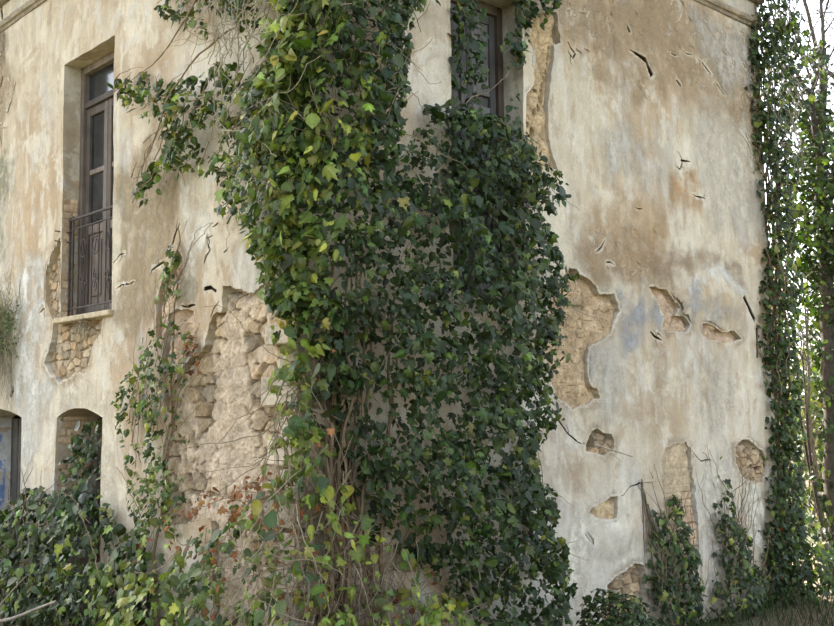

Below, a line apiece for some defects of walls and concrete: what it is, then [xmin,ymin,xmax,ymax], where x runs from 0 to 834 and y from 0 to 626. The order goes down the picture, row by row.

flaking render [61,199,78,317]
spalling [546,268,616,409]
spalling [585,430,612,455]
spalling [589,493,619,519]
flaking render [662,442,698,585]
flaking render [735,440,766,482]